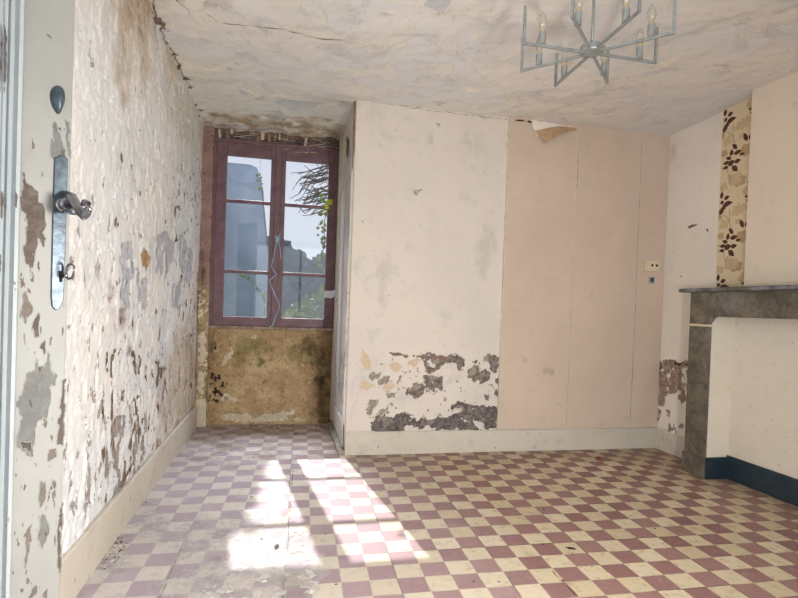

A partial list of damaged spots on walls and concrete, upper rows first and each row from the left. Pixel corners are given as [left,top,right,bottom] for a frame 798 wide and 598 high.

crack [152,0,191,88]
peeling [49,119,72,161]
flaking render [218,128,348,159]
peeling [13,172,67,468]
peeling [112,164,237,427]
peeling [221,409,306,423]
flaking render [359,348,499,432]
flaking render [657,358,688,434]
peeling [14,478,64,598]
peeling [203,574,287,598]